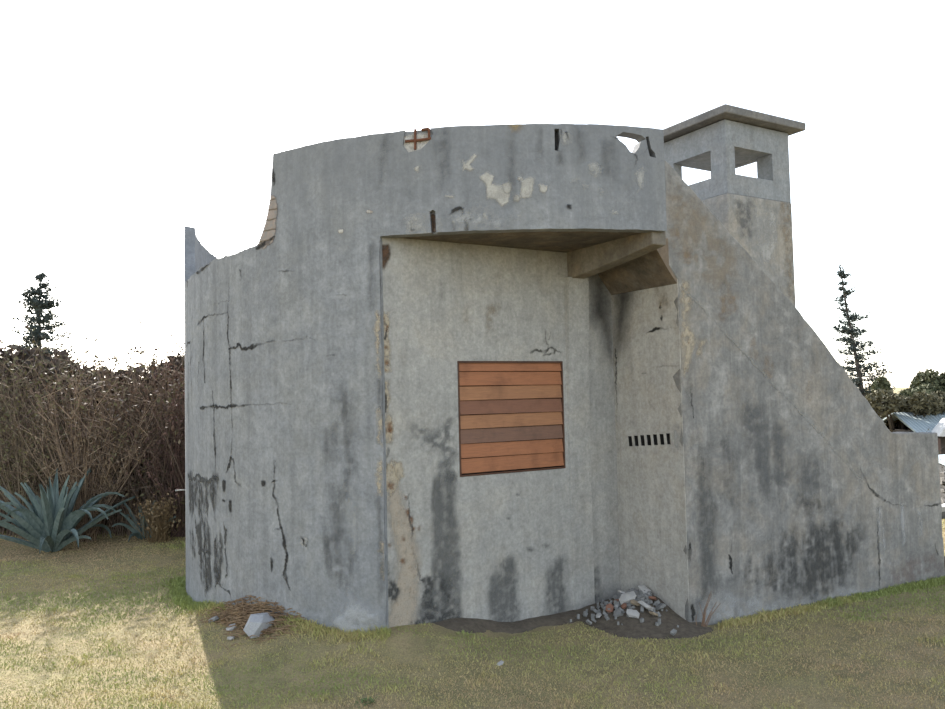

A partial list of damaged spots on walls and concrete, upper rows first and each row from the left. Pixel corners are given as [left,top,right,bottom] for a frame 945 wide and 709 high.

spalling [256,196,277,250]
peeling [463,154,547,206]
crack [186,315,257,482]
damp [188,472,230,594]
crack [270,467,290,588]
damp [416,469,461,624]
damp [490,559,517,622]
damp [547,560,564,614]